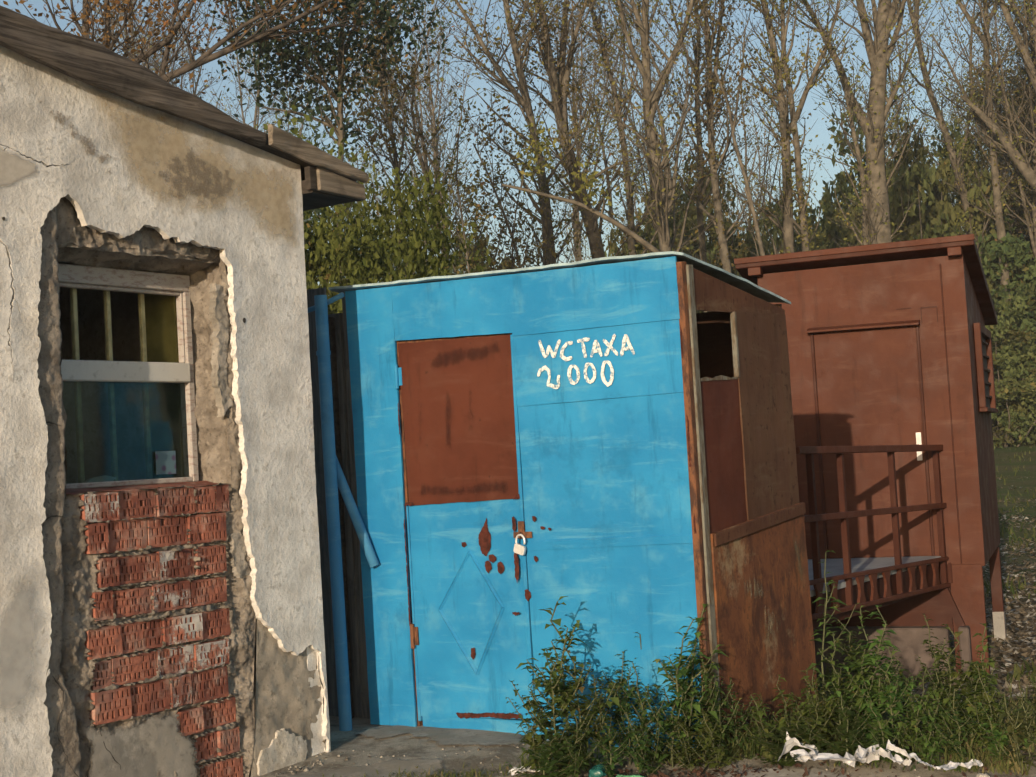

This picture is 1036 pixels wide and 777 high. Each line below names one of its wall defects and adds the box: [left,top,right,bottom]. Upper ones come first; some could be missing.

damp [106,104,293,236]
flaking render [37,197,325,777]
corrosion [461,518,531,601]